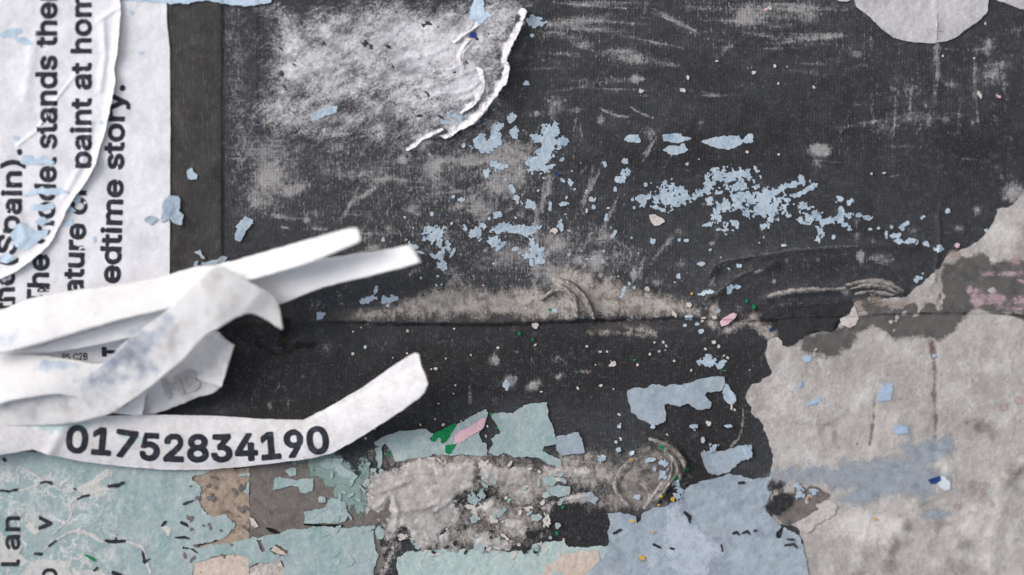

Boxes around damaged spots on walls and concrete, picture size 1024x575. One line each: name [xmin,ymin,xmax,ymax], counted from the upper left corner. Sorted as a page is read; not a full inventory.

peeling [260,0,617,287]
peeling [614,158,631,192]
peeling [624,134,641,143]
peeling [663,133,753,166]
peeling [631,166,1024,575]
peeling [597,413,634,462]
peeling [186,476,258,532]
peeling [318,458,565,559]